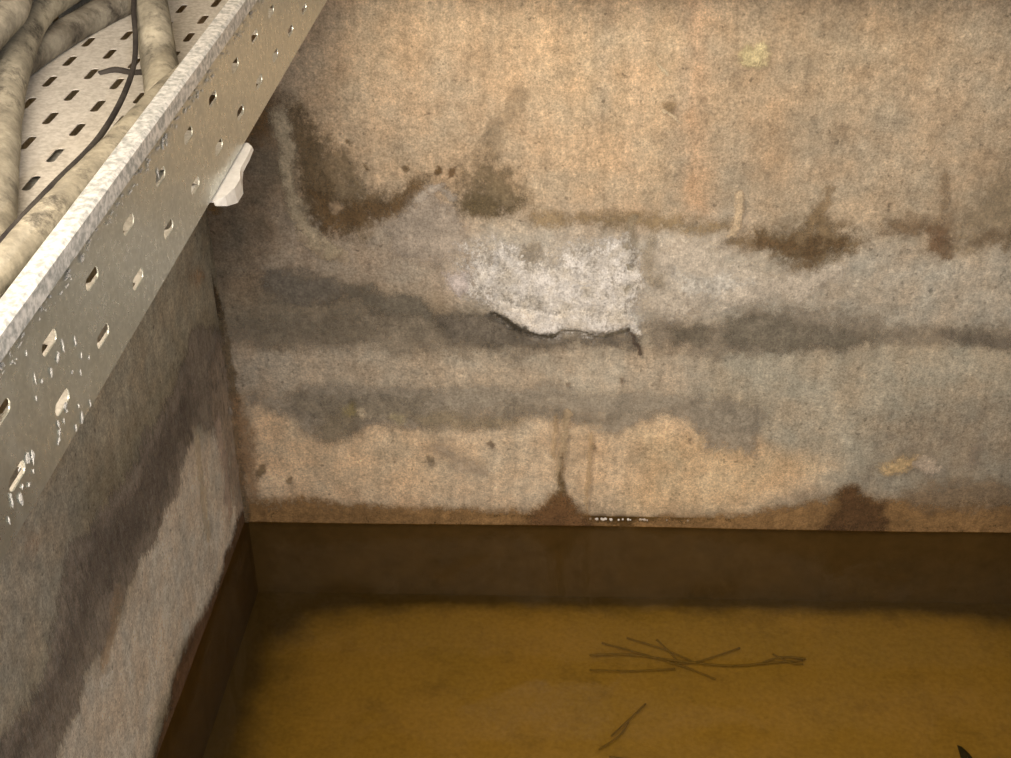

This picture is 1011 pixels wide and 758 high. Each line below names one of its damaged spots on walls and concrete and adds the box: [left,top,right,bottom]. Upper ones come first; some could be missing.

water stain [286,104,527,239]
water stain [889,174,1011,258]
water stain [0,187,1011,758]